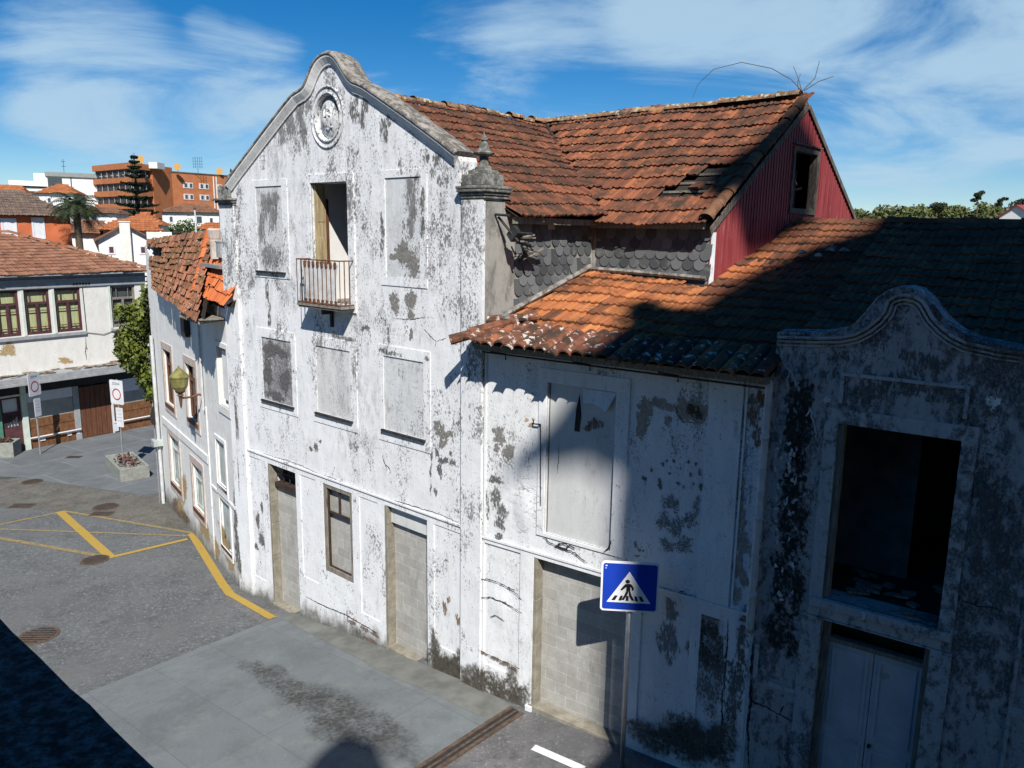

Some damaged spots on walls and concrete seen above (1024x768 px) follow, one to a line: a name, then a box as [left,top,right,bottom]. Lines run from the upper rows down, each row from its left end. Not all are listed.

peeling [389,239,420,340]
peeling [433,420,456,480]
peeling [492,426,516,460]
peeling [635,395,708,439]
peeling [642,459,702,555]
damp [764,369,817,658]
crack [481,578,522,621]
damp [427,628,531,707]
damp [619,597,749,768]
crack [721,625,792,765]